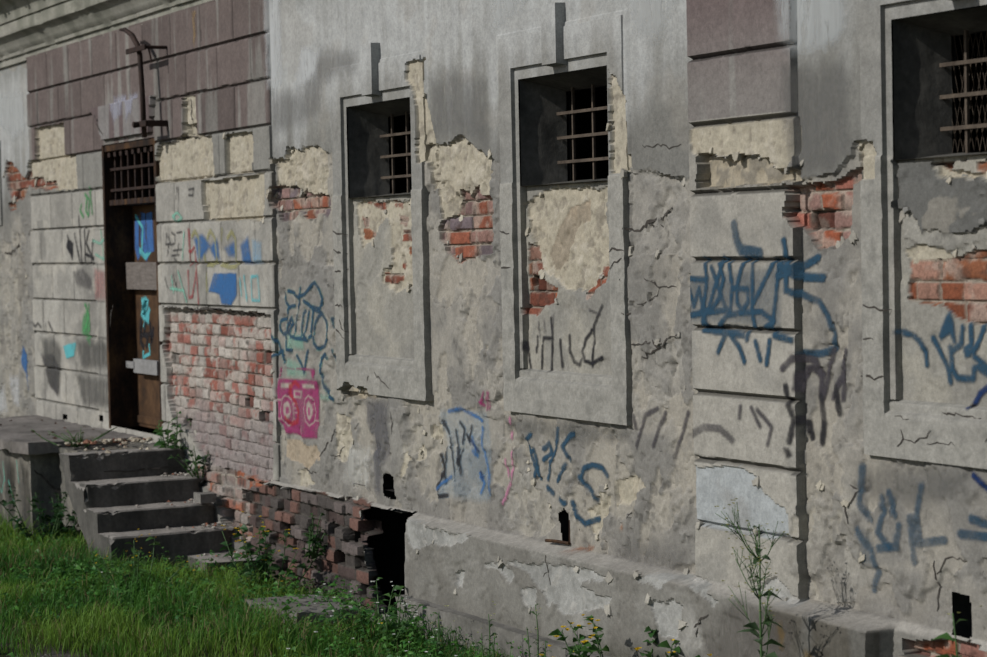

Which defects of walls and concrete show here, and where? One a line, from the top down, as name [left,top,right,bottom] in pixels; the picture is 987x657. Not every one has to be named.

spalling [265,145,331,221]
spalling [407,57,494,263]
spalling [523,184,610,315]
crack [609,207,672,280]
spalling [606,69,690,259]
crack [622,278,676,315]
crack [631,334,677,359]
spalling [692,116,877,249]
peeling [890,156,987,323]
flaking render [164,308,388,615]
crack [897,412,987,447]
spalling [694,464,870,606]